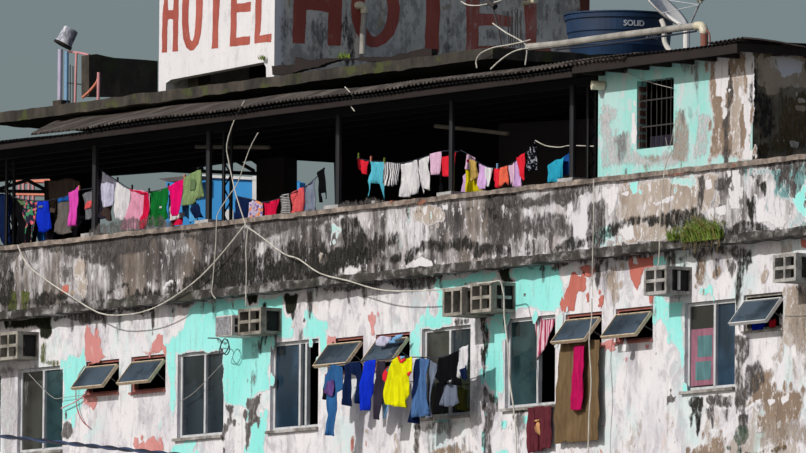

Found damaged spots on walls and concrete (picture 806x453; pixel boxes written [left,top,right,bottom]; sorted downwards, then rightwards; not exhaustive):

leakage [599,105,709,174]
spalling [594,52,806,248]
leakage [722,66,733,163]
leakage [749,59,806,190]
leakage [0,175,780,335]
peeling [60,325,105,439]
peeling [133,435,199,453]
peeling [149,294,336,453]
peeling [406,249,667,404]
peeling [649,296,687,404]
leakage [689,325,764,436]
leakage [760,419,806,453]